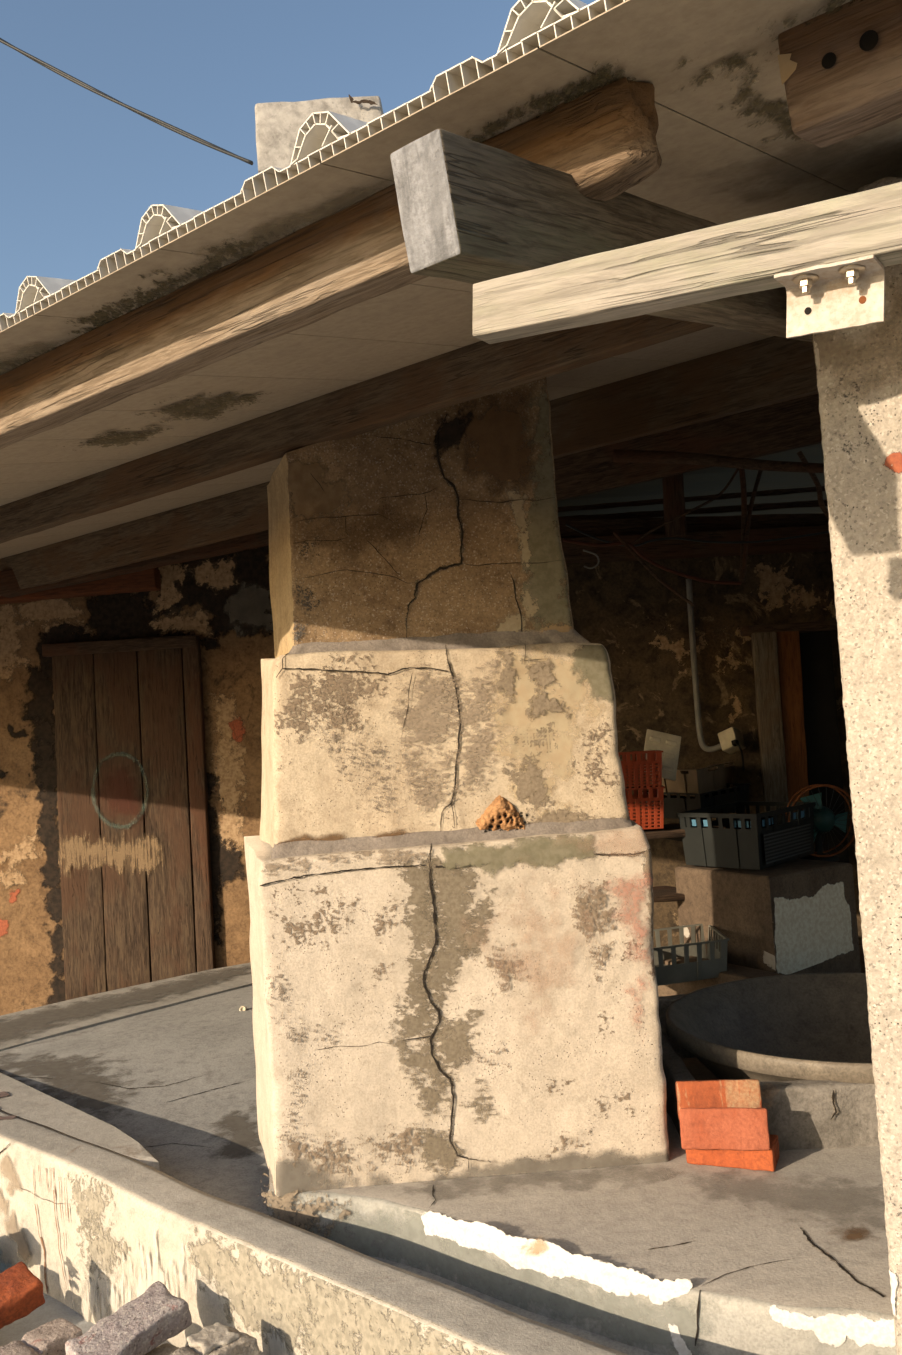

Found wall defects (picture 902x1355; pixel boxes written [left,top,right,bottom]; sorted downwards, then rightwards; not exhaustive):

leakage [80,392,264,448]
peeling [149,558,238,635]
crack [293,414,565,661]
crack [260,645,490,1168]
crack [594,848,651,857]
leakage [262,830,670,1199]
flaking render [188,1227,506,1355]
leakage [299,1209,704,1355]
peeling [421,1211,692,1305]
crack [695,1227,885,1346]
leakage [704,1177,902,1240]
peeling [769,1305,896,1348]